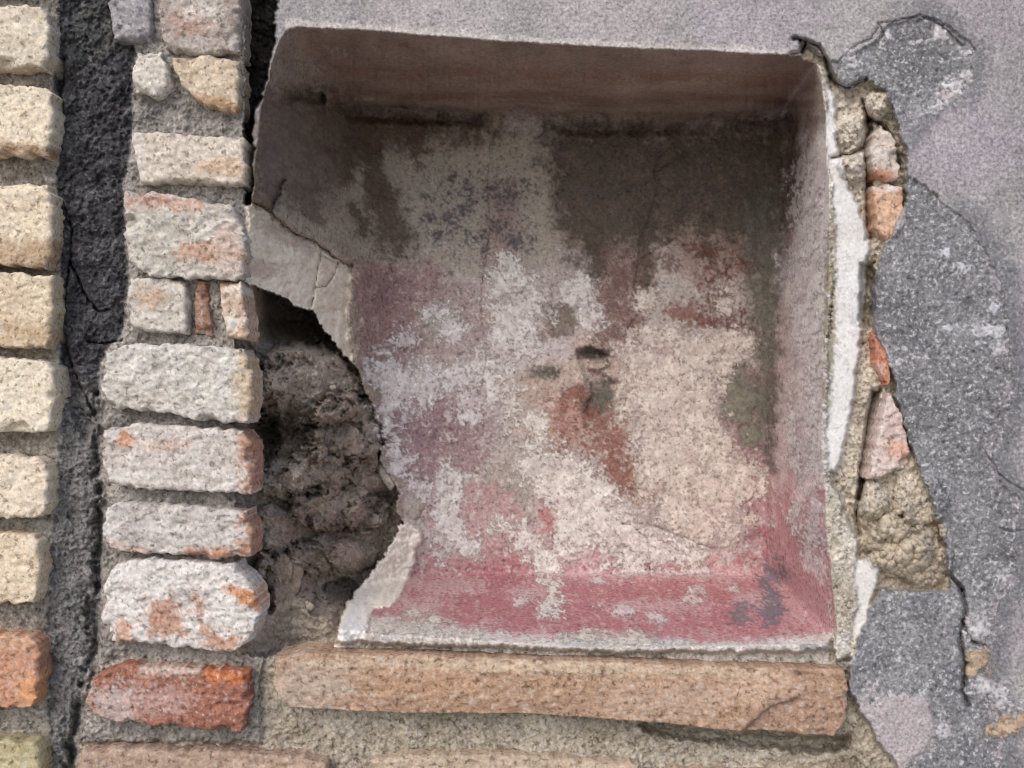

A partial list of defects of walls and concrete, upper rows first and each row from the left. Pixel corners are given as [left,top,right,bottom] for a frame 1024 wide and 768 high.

crack [252,181,349,305]
leakage [247,87,538,257]
spalling [236,196,770,659]
spalling [774,18,1024,768]